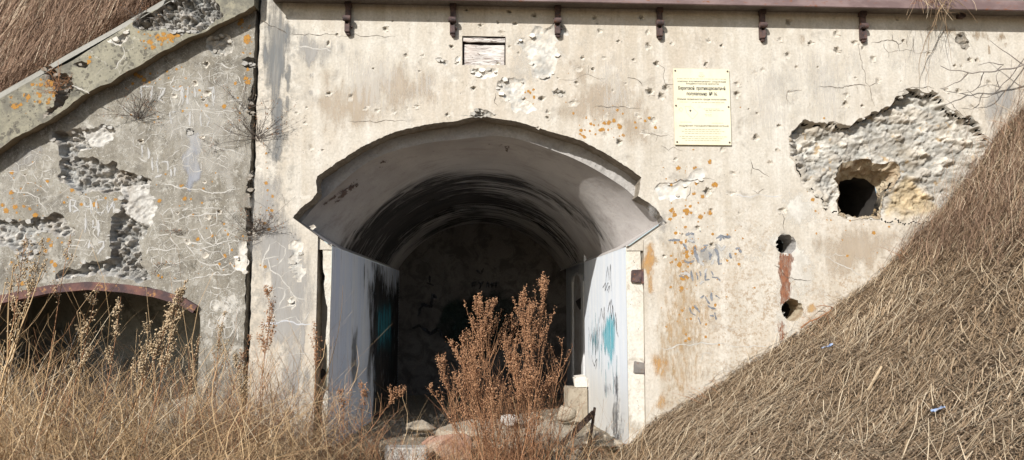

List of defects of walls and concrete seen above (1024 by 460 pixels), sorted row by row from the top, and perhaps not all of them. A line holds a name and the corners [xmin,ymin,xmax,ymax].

spalling [107,0,257,69]
spalling [403,12,608,130]
crack [786,34,927,103]
spalling [767,29,990,227]
spalling [0,212,75,260]
spalling [49,124,158,283]
spalling [655,167,714,212]
rust [778,253,794,304]